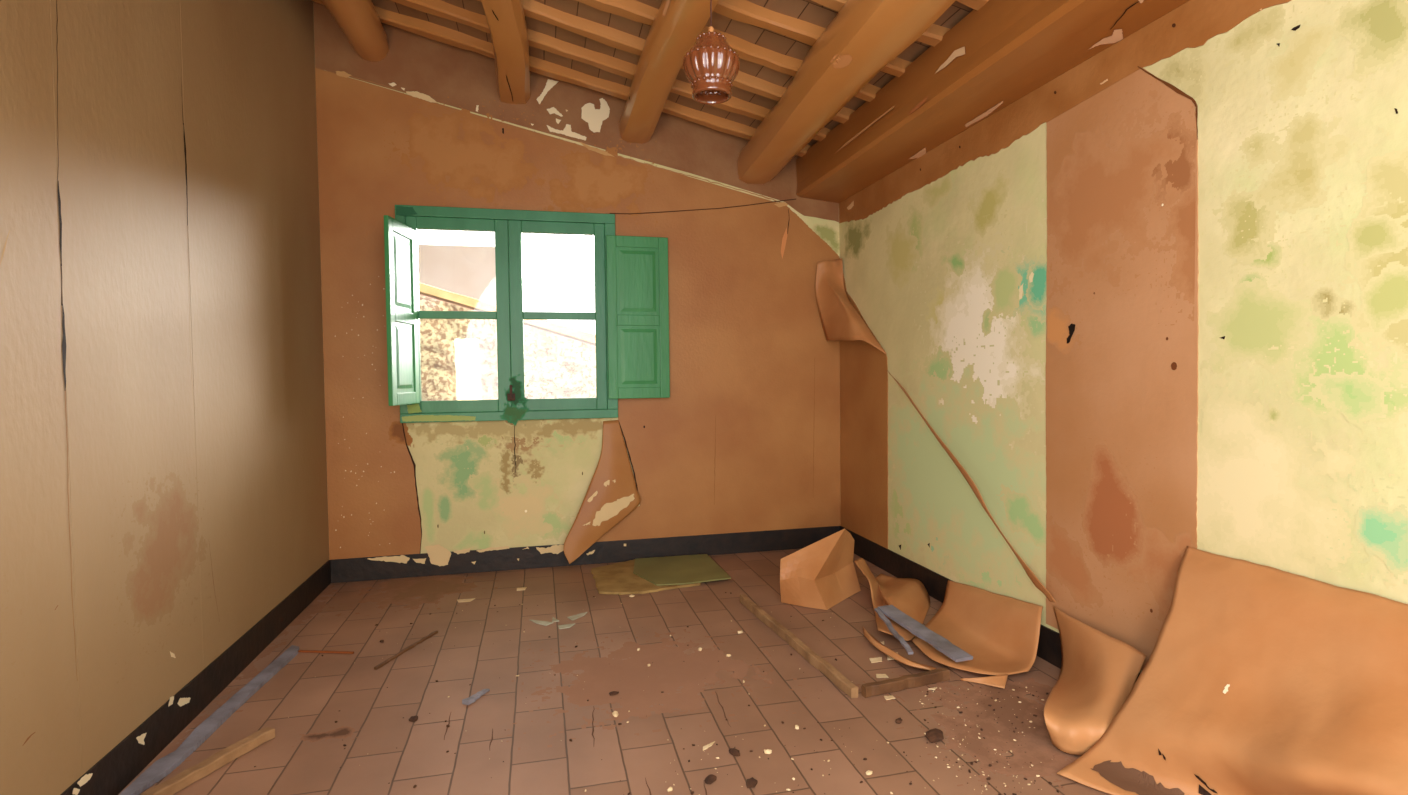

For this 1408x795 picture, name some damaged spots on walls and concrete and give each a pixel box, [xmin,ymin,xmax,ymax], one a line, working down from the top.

crack [56,0,78,681]
peeling [368,544,564,566]
peeling [531,79,788,207]
damp [811,0,1408,631]